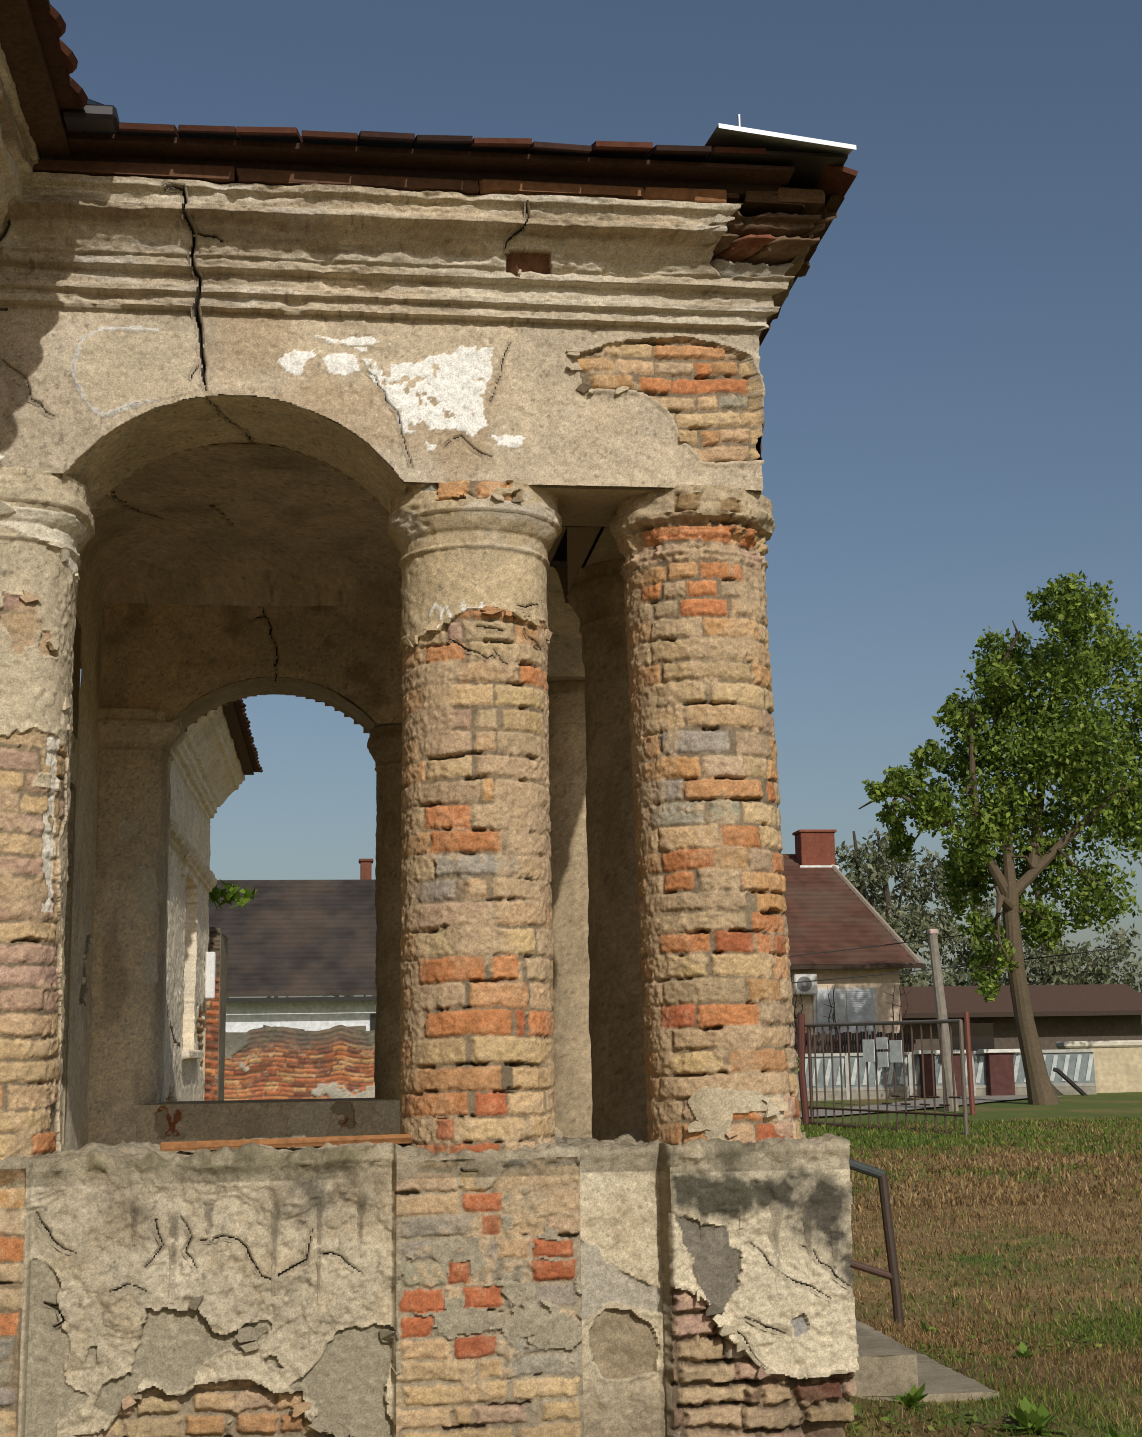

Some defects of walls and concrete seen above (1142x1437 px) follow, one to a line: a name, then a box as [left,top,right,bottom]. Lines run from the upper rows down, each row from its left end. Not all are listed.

crack [0,220,12,243]
crack [503,201,531,257]
crack [163,181,254,442]
crack [0,359,55,419]
peeling [278,335,526,450]
flaking render [565,336,764,463]
flaking render [614,492,802,1145]
flaking render [0,697,95,1437]
flaking render [396,600,857,1437]
crack [34,1212,77,1257]
crack [109,1214,363,1295]
flaking render [108,1379,354,1437]